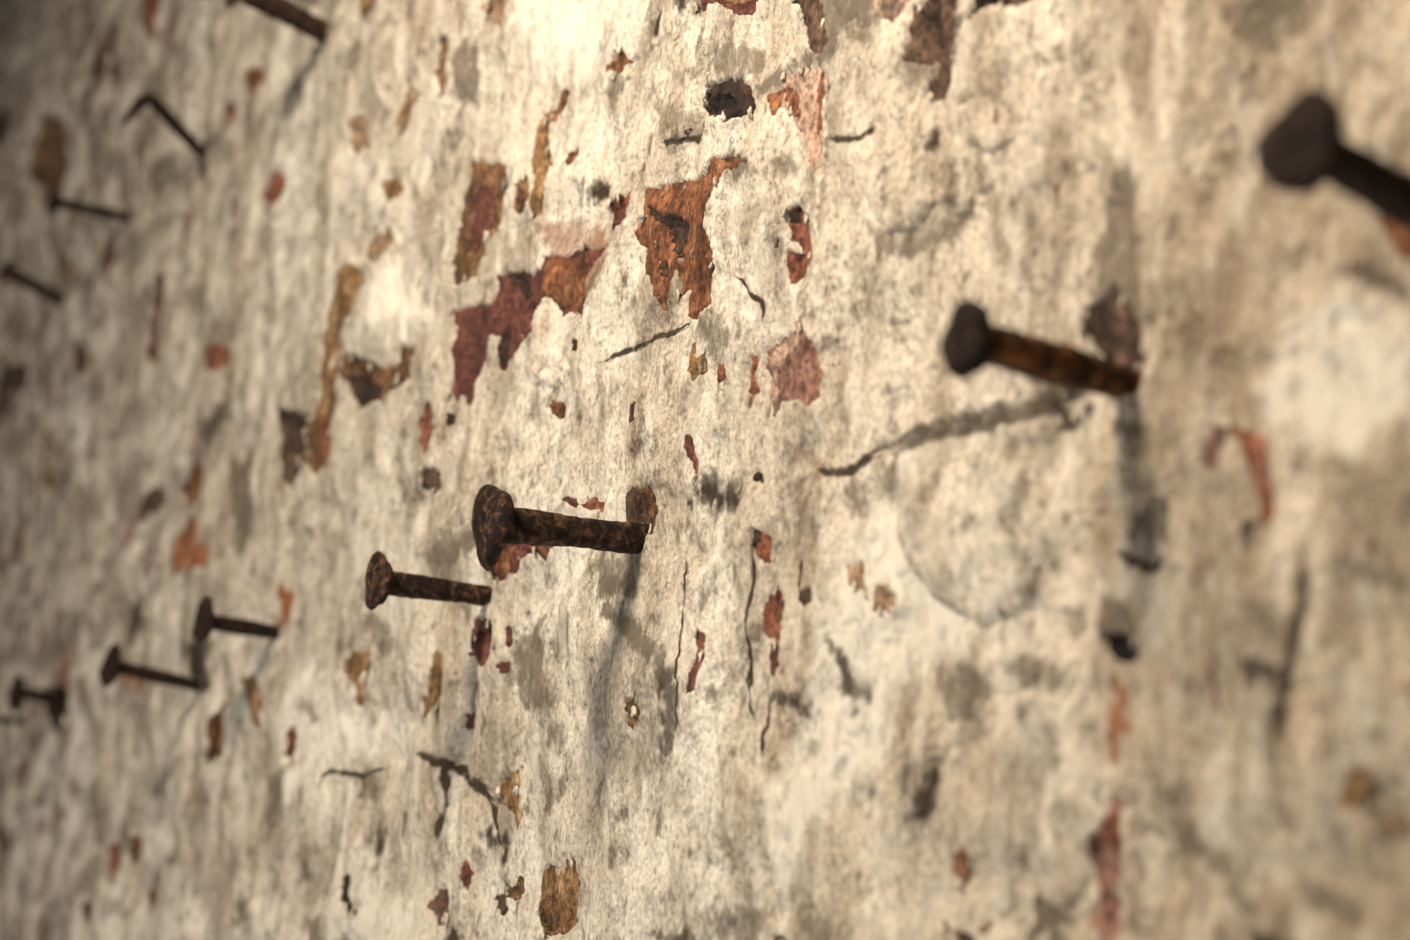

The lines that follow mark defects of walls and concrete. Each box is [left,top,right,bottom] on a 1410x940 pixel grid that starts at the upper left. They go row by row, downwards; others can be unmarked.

peeling [693,0,831,174]
peeling [874,0,1031,103]
peeling [605,156,747,320]
peeling [277,225,415,492]
peeling [417,237,606,498]
crack [599,322,690,363]
peeling [748,313,824,417]
crack [817,390,1082,476]
crack [744,534,770,759]
crack [318,752,502,846]
peeling [495,855,580,940]